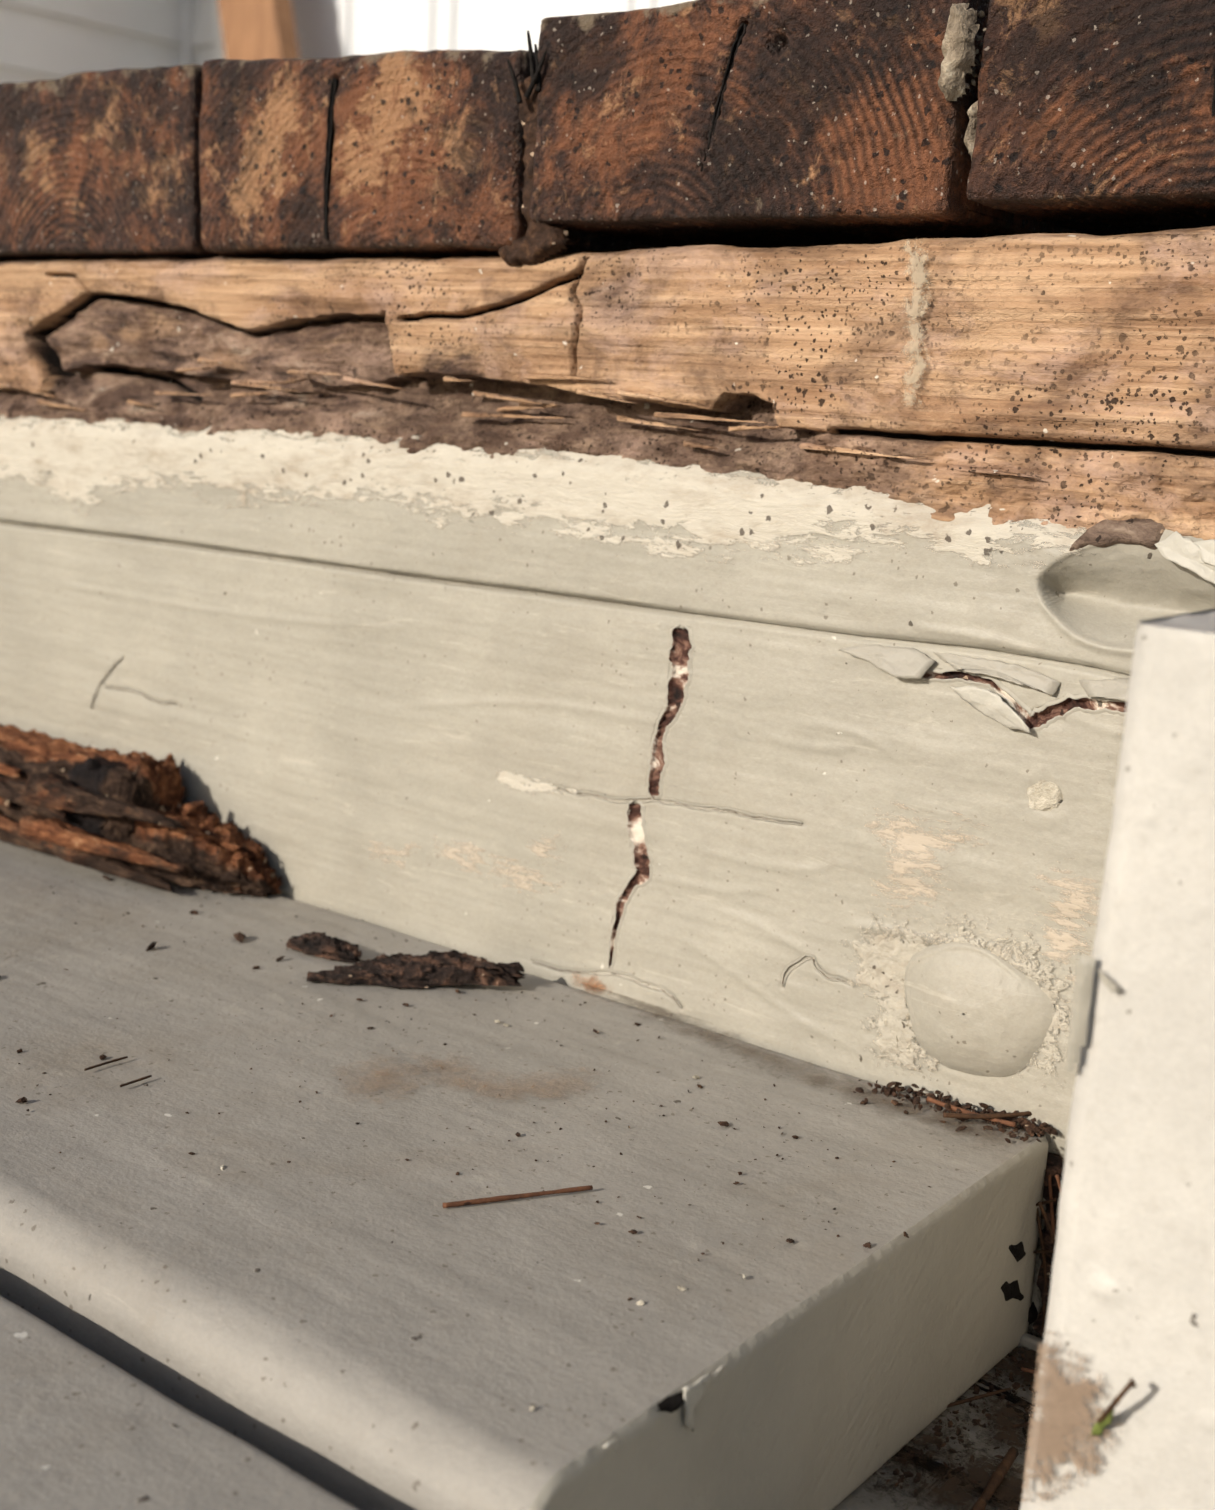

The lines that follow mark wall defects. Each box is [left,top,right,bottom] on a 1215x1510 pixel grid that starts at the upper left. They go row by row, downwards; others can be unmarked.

peeling [0,415,1215,584]
crack [0,519,1131,1009]